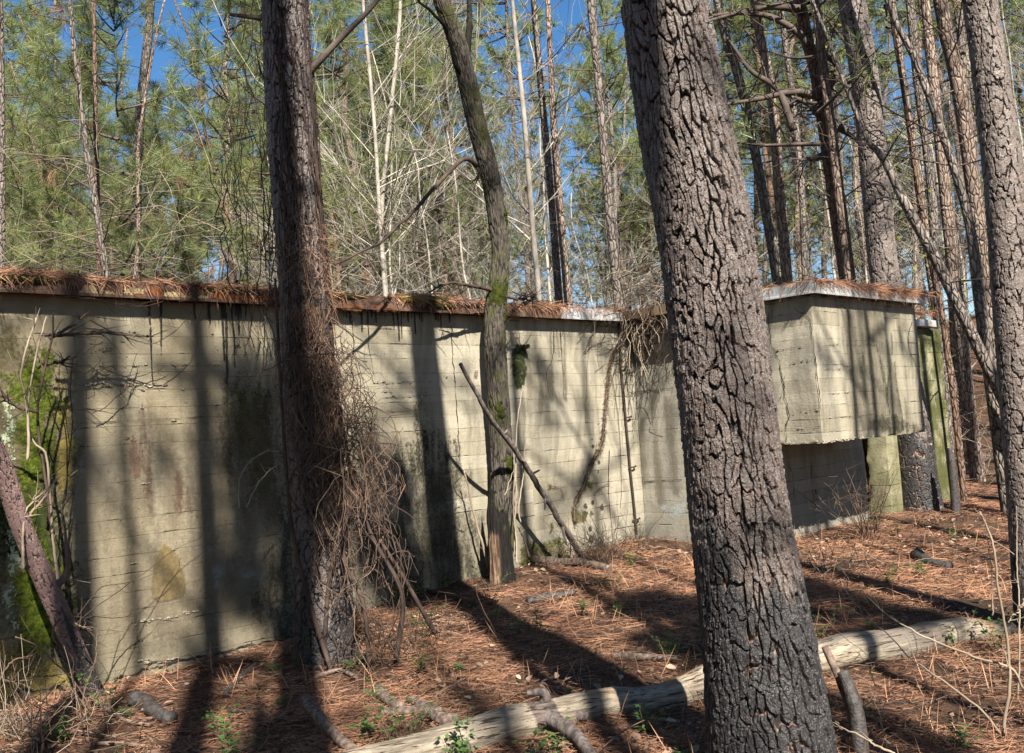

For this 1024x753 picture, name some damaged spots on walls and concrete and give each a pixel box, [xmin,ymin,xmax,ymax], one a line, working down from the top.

leakage [0,315,84,571]
leakage [148,303,162,384]
leakage [193,303,288,520]
leakage [0,500,69,688]
leakage [152,544,185,601]